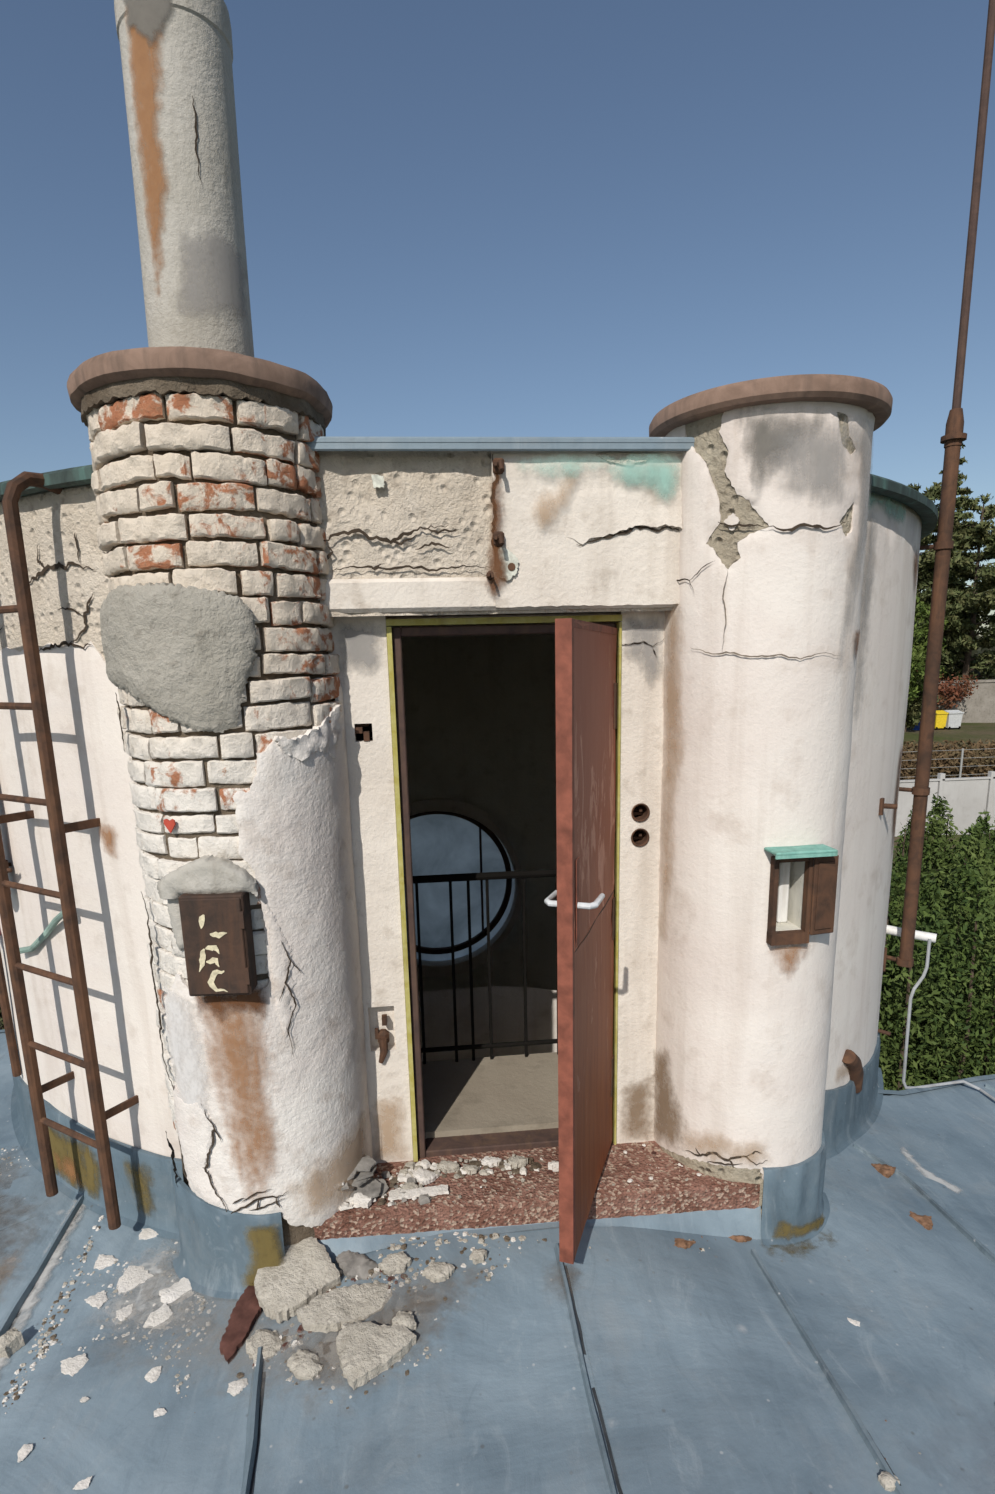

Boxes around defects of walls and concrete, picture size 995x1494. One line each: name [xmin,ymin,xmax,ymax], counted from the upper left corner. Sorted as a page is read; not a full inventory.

rust [127,15,165,258]
peeling [0,485,110,660]
rust [488,475,506,595]
crack [618,561,840,659]
crack [718,522,846,532]
crack [115,692,125,751]
crack [141,892,288,1214]
rust [196,988,271,1175]
crack [279,941,302,1057]
leakage [628,1055,678,1143]